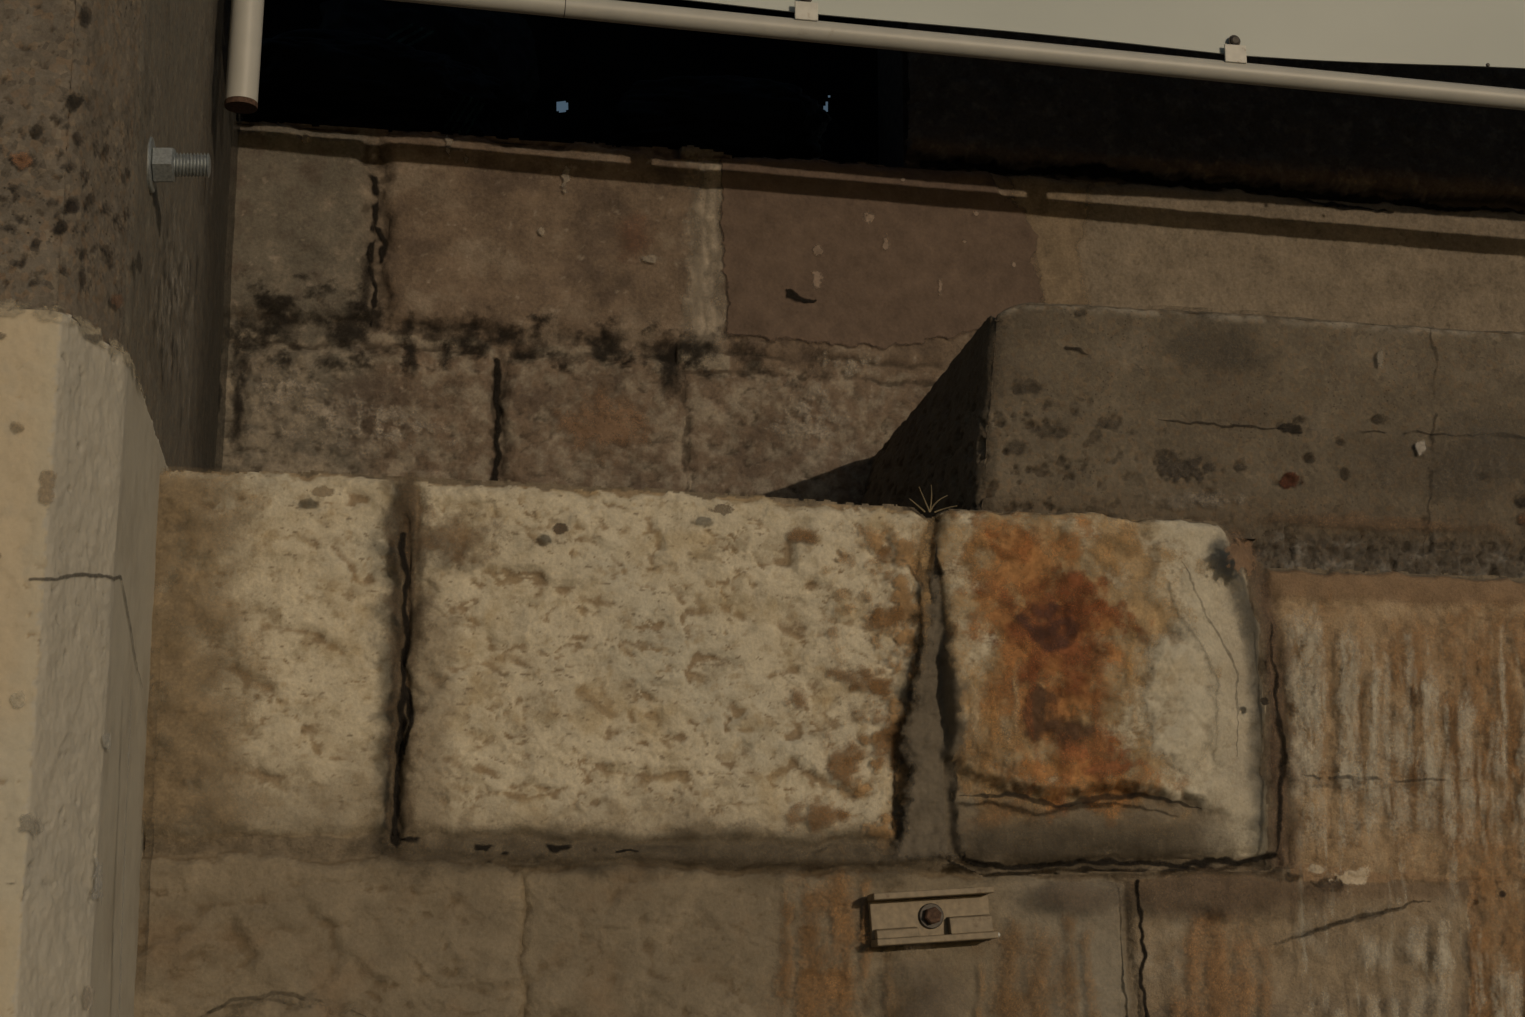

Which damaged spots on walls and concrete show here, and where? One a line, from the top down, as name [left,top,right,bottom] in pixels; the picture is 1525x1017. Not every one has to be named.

crack [366,175,388,327]
crack [491,358,503,481]
crack [29,573,142,684]
crack [933,543,944,603]
corrosion [788,511,1178,855]
crack [950,623,1467,1017]
efflorescence [1398,668,1499,832]